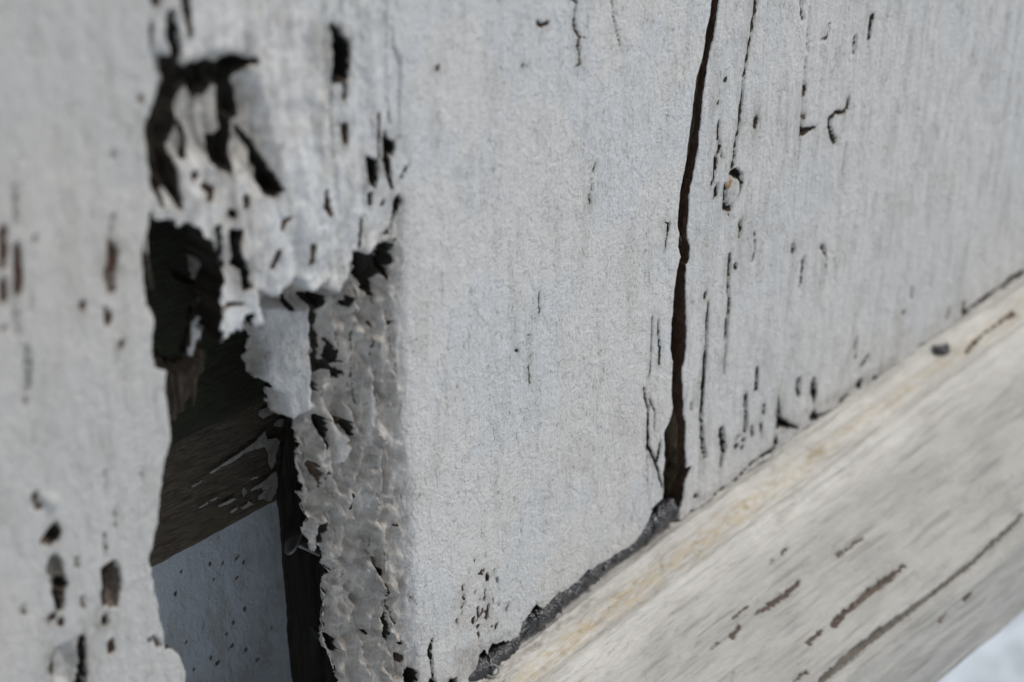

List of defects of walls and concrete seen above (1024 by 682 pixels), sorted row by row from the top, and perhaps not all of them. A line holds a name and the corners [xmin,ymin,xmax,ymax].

crack [685,0,760,202]
peeling [143,0,402,465]
crack [663,219,682,252]
peeling [198,471,278,513]
crack [642,310,681,495]